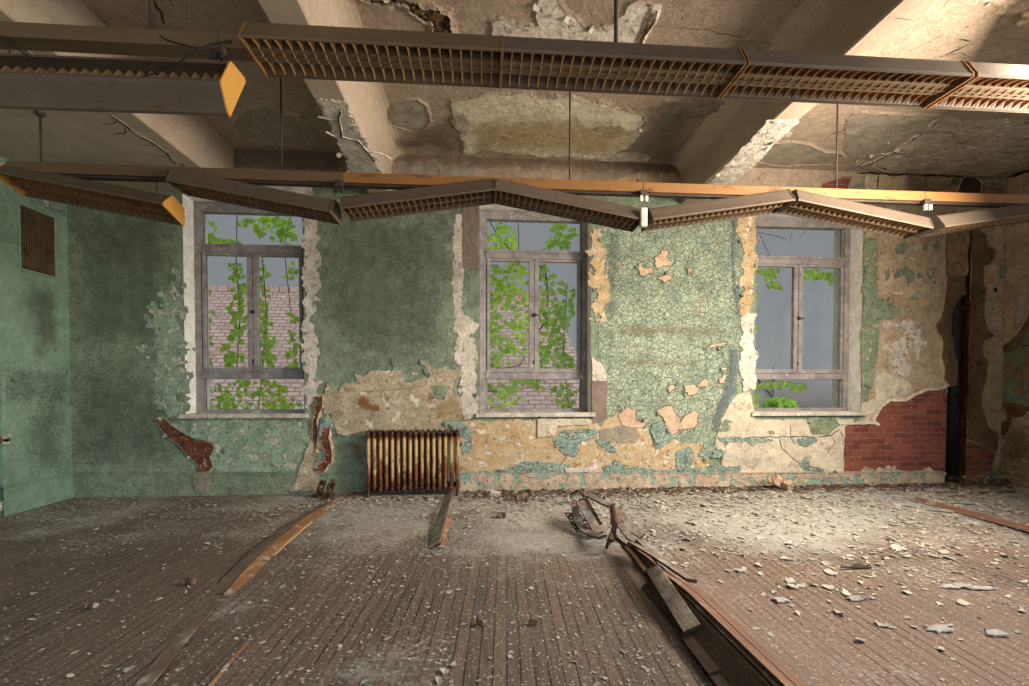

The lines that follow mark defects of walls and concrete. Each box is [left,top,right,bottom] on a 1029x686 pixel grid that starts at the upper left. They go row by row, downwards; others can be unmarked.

crack [154,0,175,24]
flaking render [358,0,460,33]
peeling [486,0,662,44]
crack [907,0,976,58]
water stain [480,123,621,150]
peeling [867,204,991,218]
peeling [135,212,1029,492]
crack [598,218,844,467]